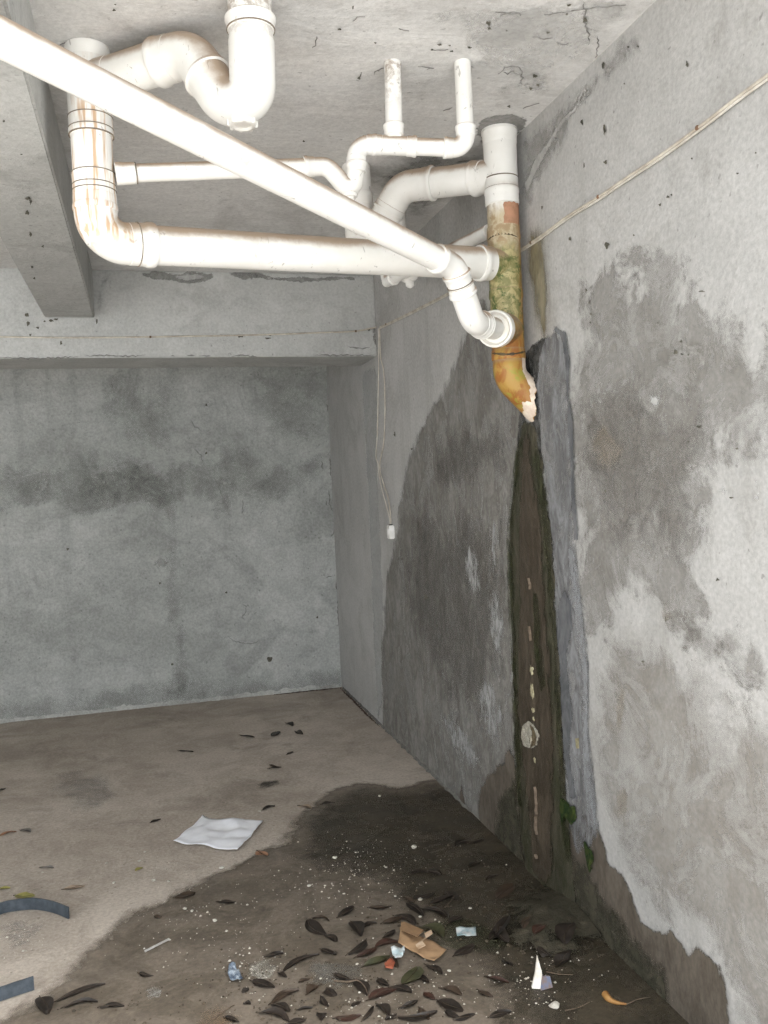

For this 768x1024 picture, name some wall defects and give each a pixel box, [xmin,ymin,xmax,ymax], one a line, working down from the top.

crack [496,1,625,58]
crack [498,66,539,109]
leakage [0,234,768,1024]